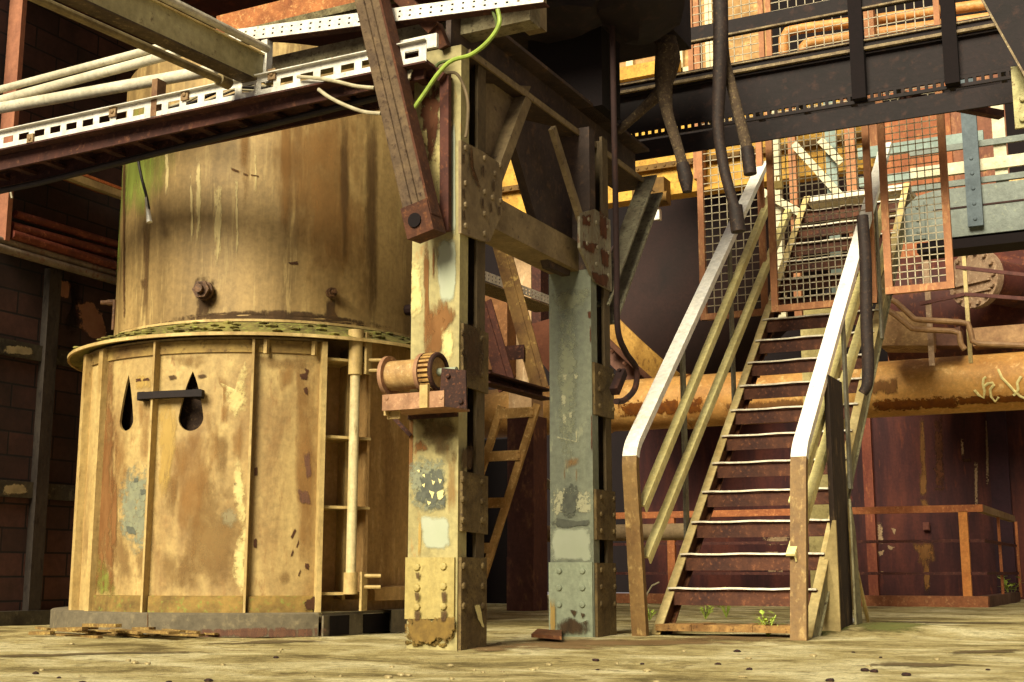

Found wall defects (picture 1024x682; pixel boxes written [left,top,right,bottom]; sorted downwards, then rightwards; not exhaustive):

water stain [190,165,201,237]
water stain [214,188,222,258]
water stain [366,133,377,278]
rust [582,210,610,289]
rust [423,248,435,353]
rust [618,400,643,417]
rust [657,397,703,415]
rust [872,378,1024,506]
peeling [119,465,147,549]
peeling [409,459,446,512]
peeling [551,484,591,528]
rust [914,543,935,589]